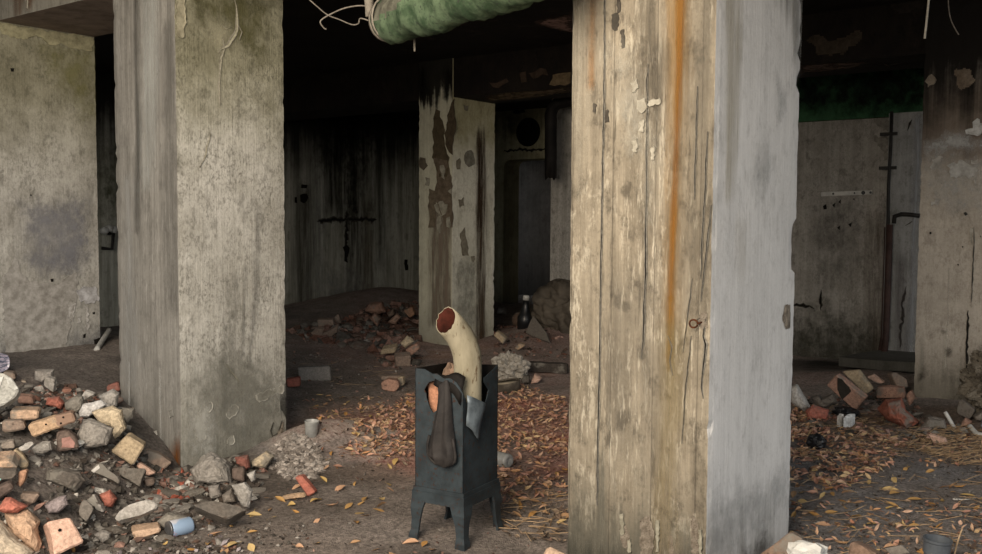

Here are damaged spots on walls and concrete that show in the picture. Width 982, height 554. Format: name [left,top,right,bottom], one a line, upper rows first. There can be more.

peeling [419,99,475,262]
water stain [430,131,487,340]
corrosion [667,190,676,367]
corrosion [675,0,684,133]
crack [898,288,906,347]
peeling [954,68,975,90]
peeling [965,118,982,136]